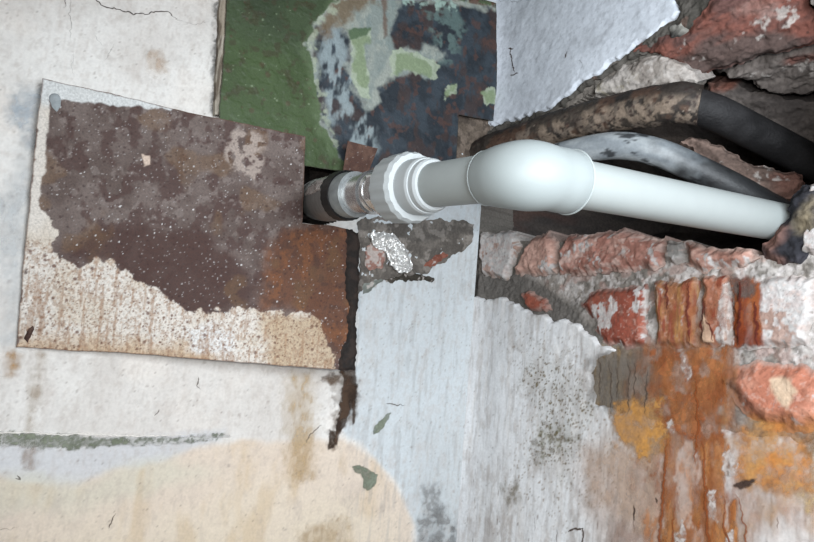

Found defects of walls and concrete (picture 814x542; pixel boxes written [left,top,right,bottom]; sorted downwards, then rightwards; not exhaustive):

crack [96,0,173,17]
spalling [456,0,814,159]
spalling [302,214,336,225]
spalling [304,166,338,185]
spalling [357,124,814,443]
corrosion [613,274,812,542]